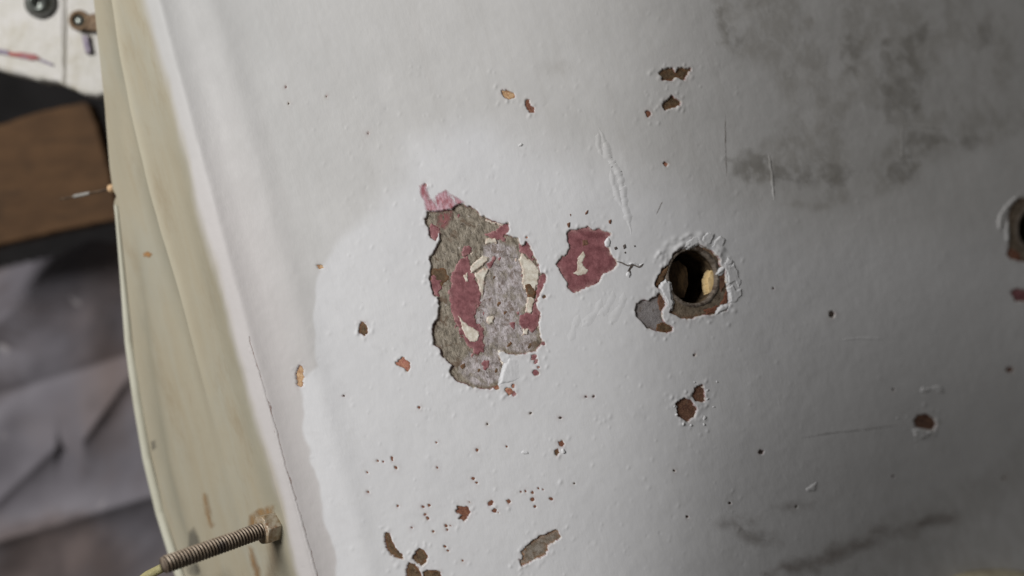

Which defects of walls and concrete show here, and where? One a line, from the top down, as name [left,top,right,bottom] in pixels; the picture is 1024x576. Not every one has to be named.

peeling [659,68,690,81]
peeling [663,96,680,110]
peeling [997,196,1018,243]
peeling [556,210,616,292]
peeling [420,184,546,396]
peeling [635,266,675,332]
peeling [682,232,742,315]
peeling [676,385,704,421]
peeling [913,414,935,430]
peeling [385,533,441,576]
peeling [520,530,561,565]